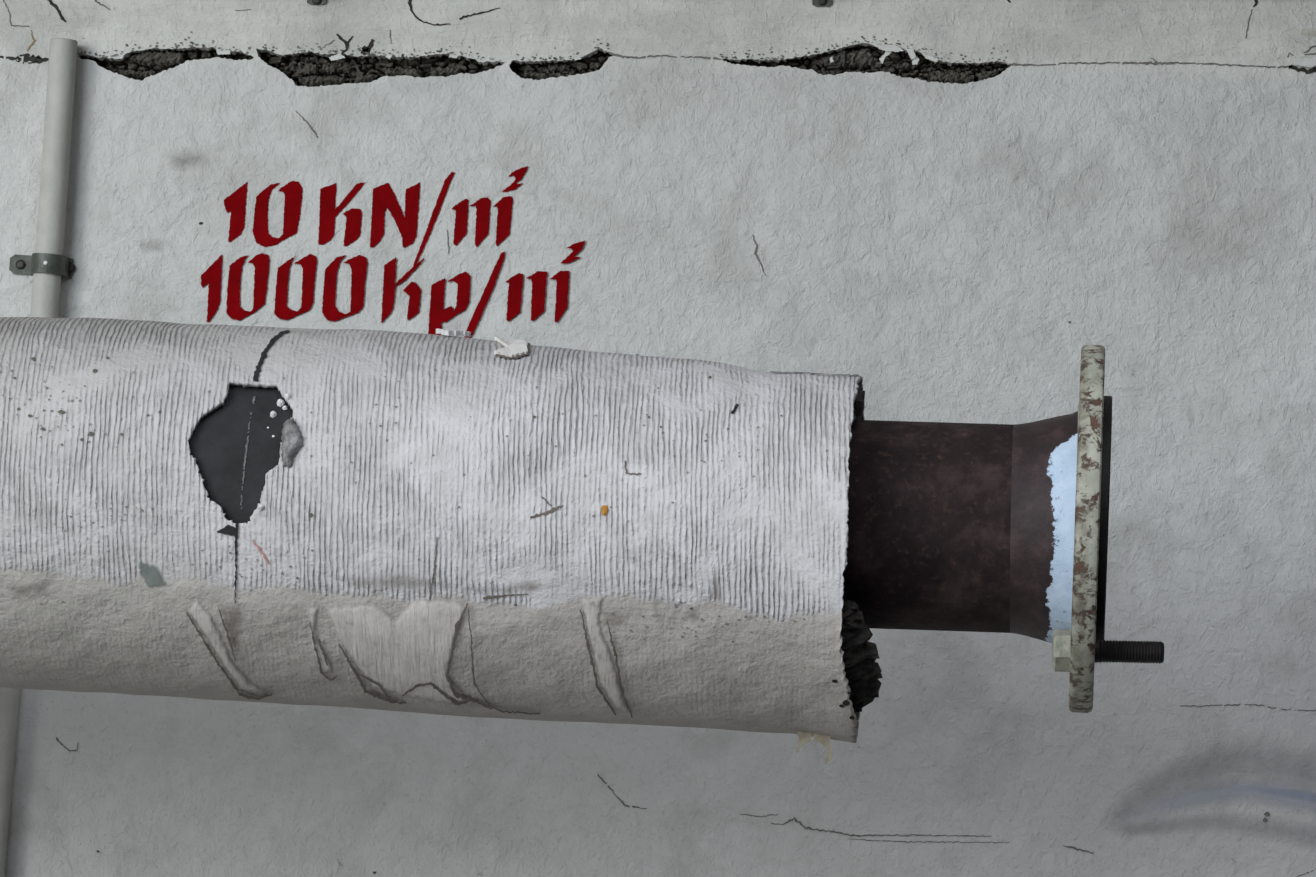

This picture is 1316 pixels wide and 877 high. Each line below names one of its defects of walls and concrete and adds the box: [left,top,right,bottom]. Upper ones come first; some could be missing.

crack [0,0,66,64]
spalling [80,31,612,87]
crack [322,0,499,55]
crack [616,52,717,60]
spalling [719,36,1011,84]
crack [1180,703,1316,711]
crack [740,814,1009,843]